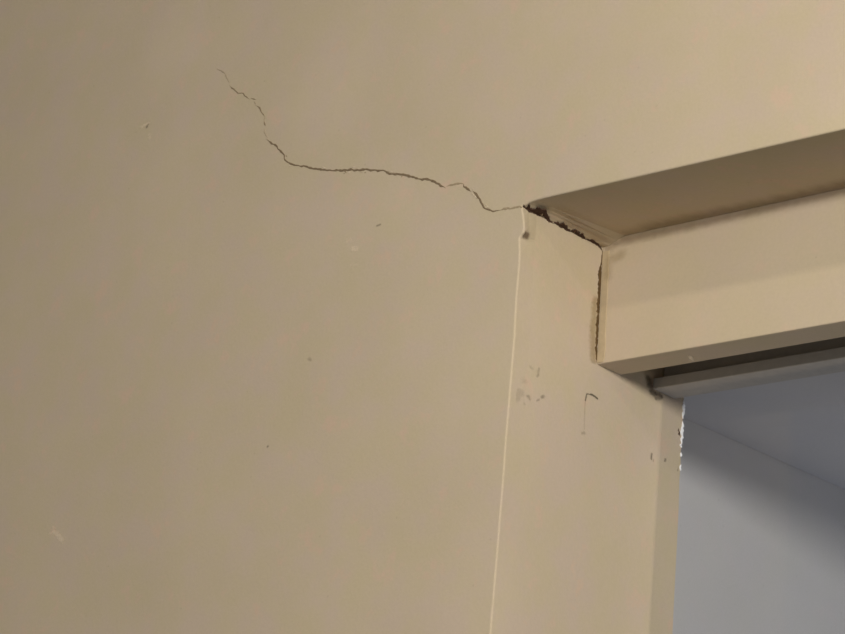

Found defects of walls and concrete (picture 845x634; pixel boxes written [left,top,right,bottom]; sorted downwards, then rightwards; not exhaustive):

crack [218,69,603,360]